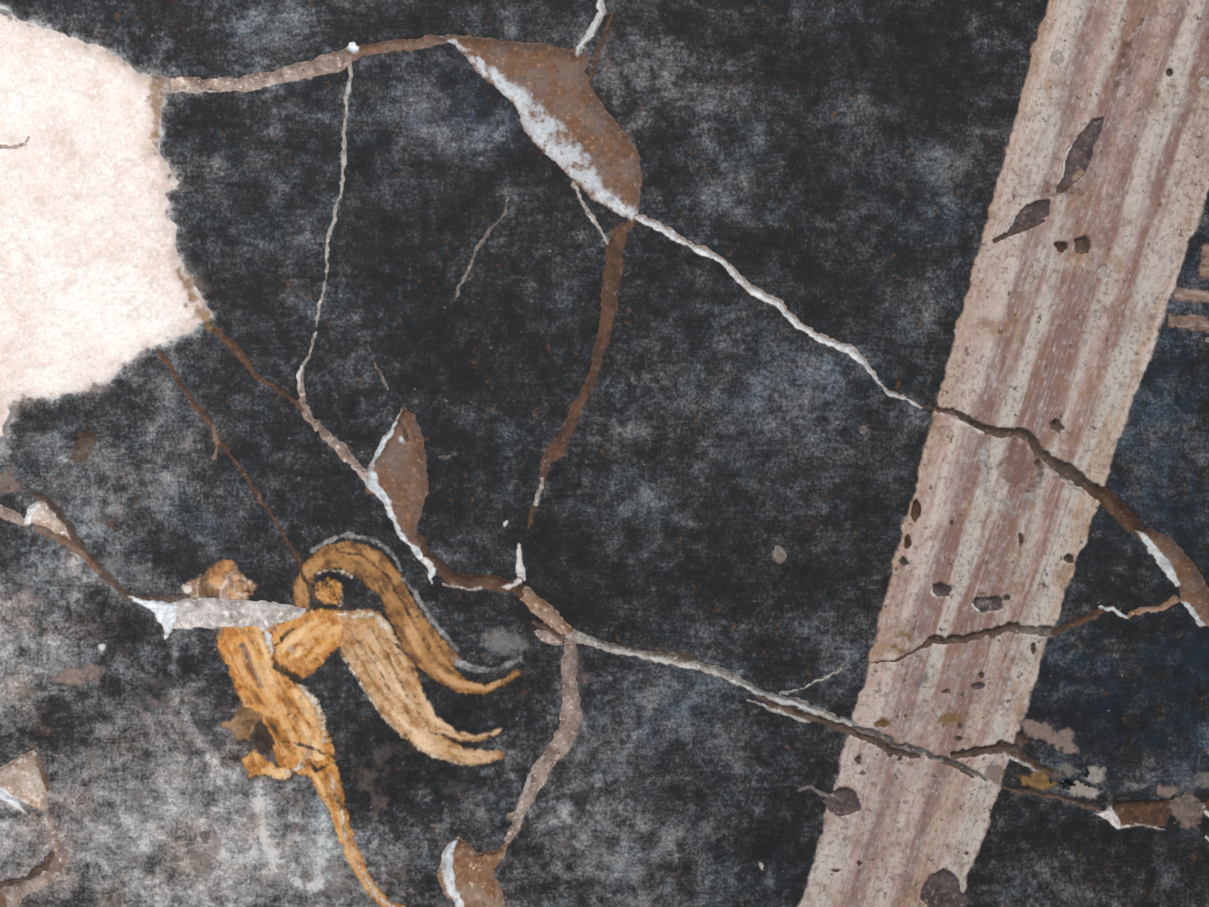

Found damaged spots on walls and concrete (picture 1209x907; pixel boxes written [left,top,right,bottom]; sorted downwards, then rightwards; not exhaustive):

crack [0,136,30,149]
peeling [0,9,212,445]
crack [151,34,472,484]
crack [455,184,509,298]
spalling [440,36,642,244]
crack [0,492,190,603]
crack [157,350,319,603]
spalling [365,408,451,584]
crack [416,214,1181,843]
spalling [1134,528,1209,627]
spalling [1019,719,1209,841]
spalling [437,836,508,907]